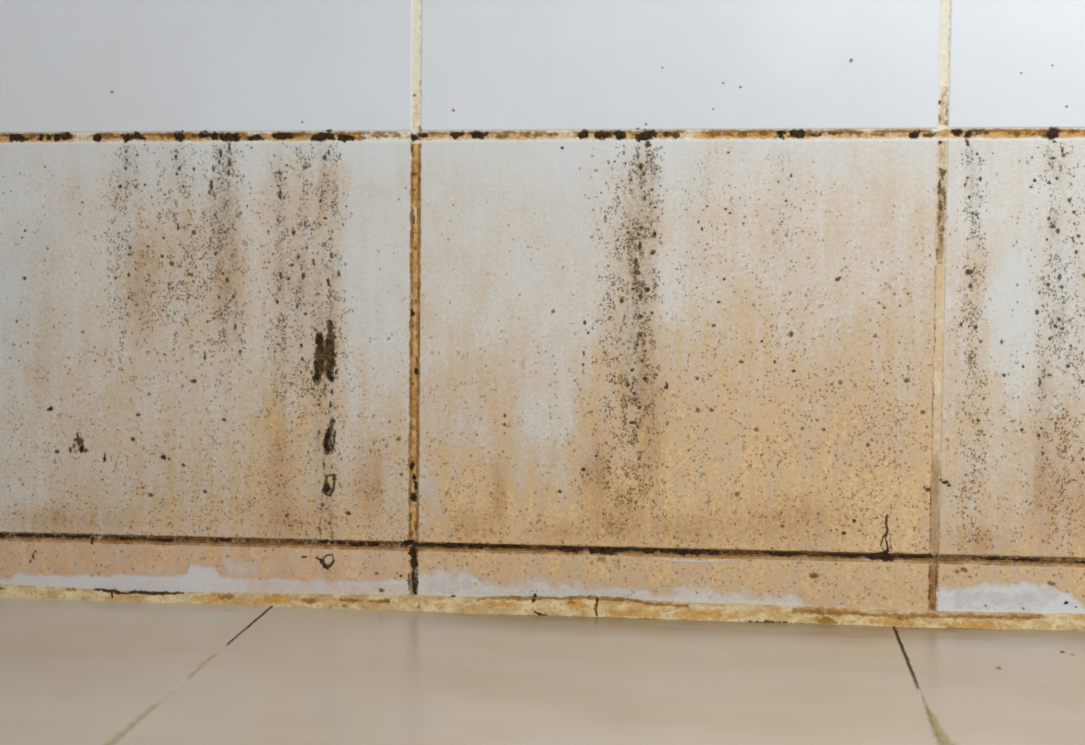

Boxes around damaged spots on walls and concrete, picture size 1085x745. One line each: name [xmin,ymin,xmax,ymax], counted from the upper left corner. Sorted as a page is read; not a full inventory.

leakage [0,101,1085,611]